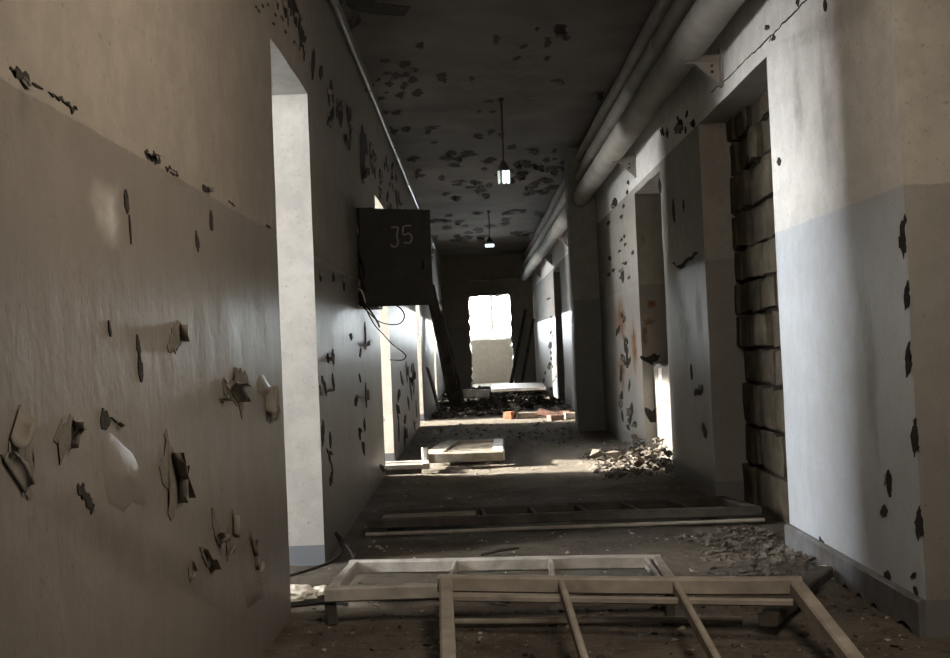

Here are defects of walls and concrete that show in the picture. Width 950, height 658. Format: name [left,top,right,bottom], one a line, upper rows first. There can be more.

crack [711,0,807,93]
peeling [255,0,411,209]
peeling [439,129,565,202]
peeling [53,414,88,465]
peeling [159,429,196,521]
peeling [167,320,190,354]
peeling [219,367,256,418]
peeling [319,349,335,396]
peeling [321,420,333,486]
peeling [396,363,417,447]
peeling [616,312,664,431]
peeling [188,507,268,584]